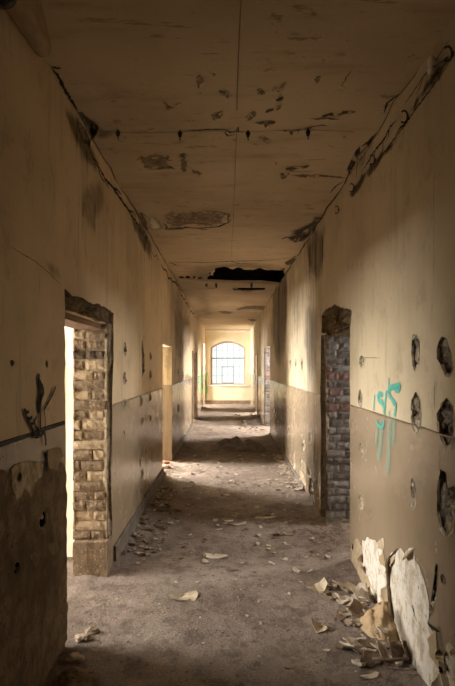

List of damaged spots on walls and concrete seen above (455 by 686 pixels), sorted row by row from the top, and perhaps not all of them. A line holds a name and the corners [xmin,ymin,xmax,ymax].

peeling [137,153,172,170]
crack [48,41,452,318]
peeling [163,211,230,230]
flaking render [411,334,420,372]
flaking render [437,336,454,377]
flaking render [64,289,114,539]
flaking render [292,304,352,524]
flaking render [410,392,422,437]
flaking render [437,398,454,450]
peeling [0,446,68,686]
peeling [351,537,455,686]